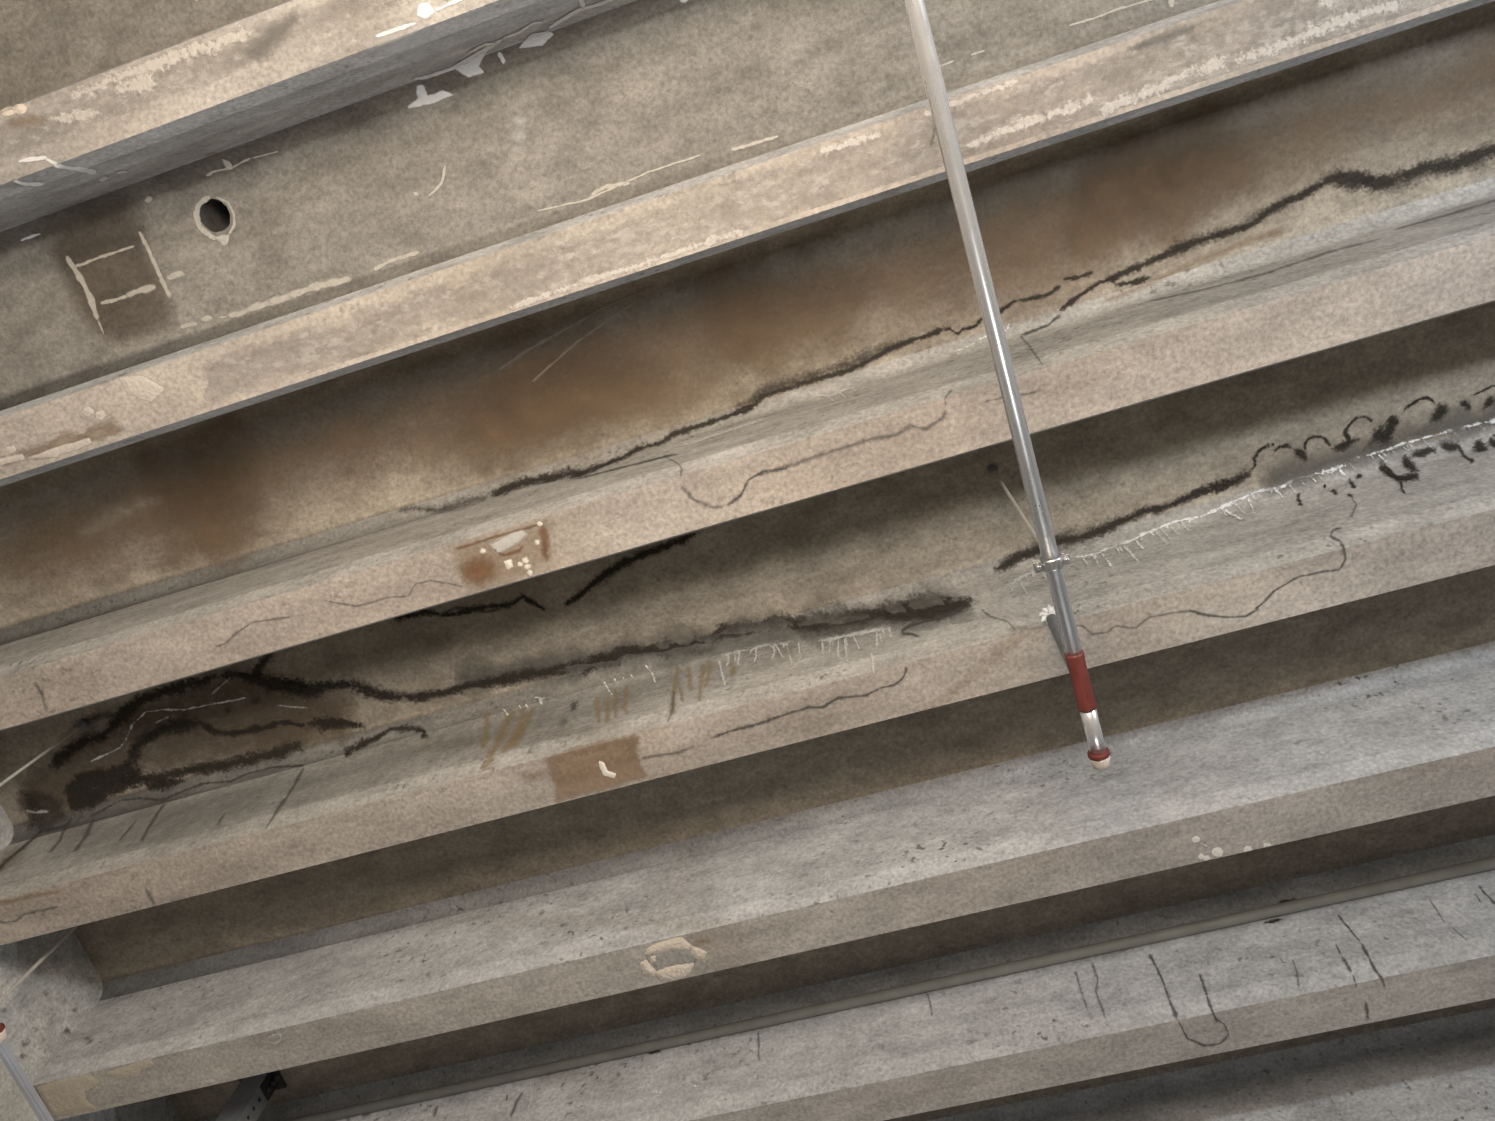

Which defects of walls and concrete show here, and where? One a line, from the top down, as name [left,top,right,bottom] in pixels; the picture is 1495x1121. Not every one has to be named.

peeling [0,3,383,162]
water stain [978,40,1495,283]
water stain [1000,145,1495,331]
water stain [22,227,987,564]
crack [684,391,951,507]
water stain [996,385,1495,594]
water stain [565,533,696,606]
crack [1079,498,1357,635]
crack [644,668,907,758]
spalling [640,937,707,980]
crack [1149,954,1229,1046]
crack [1336,915,1385,1018]